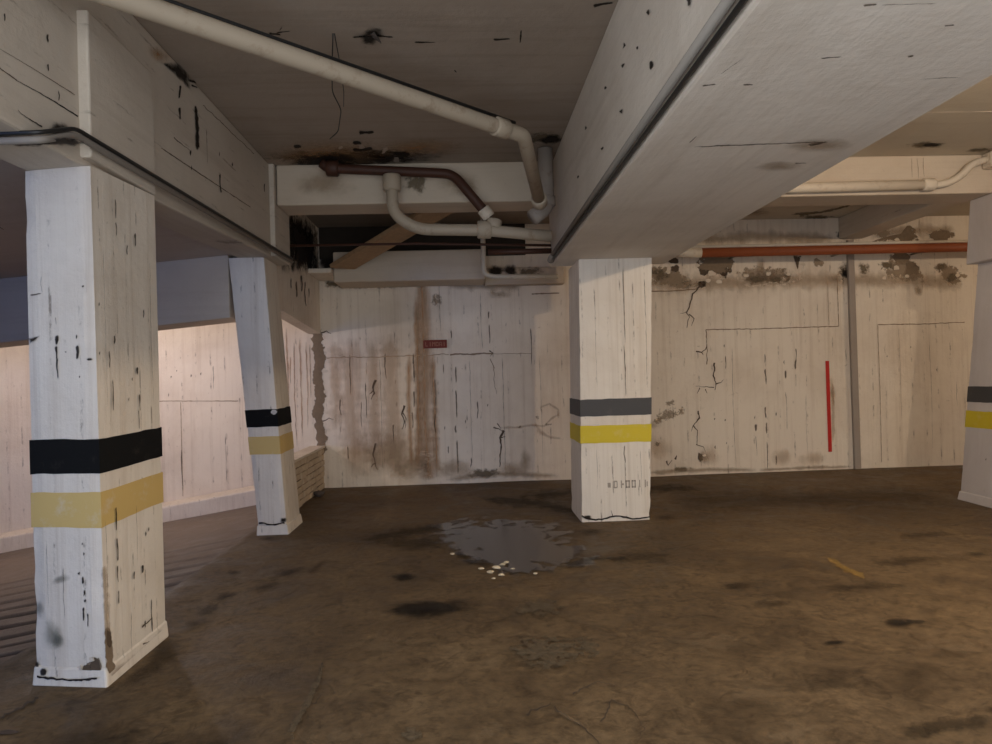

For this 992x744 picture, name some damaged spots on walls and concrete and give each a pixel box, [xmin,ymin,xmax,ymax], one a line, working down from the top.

peeling [873,226,955,242]
peeling [652,256,824,289]
peeling [881,253,924,282]
peeling [935,264,967,284]
crack [680,281,706,326]
spalling [311,330,333,454]
leakage [434,365,488,465]
crack [666,346,723,465]
crack [493,423,505,467]